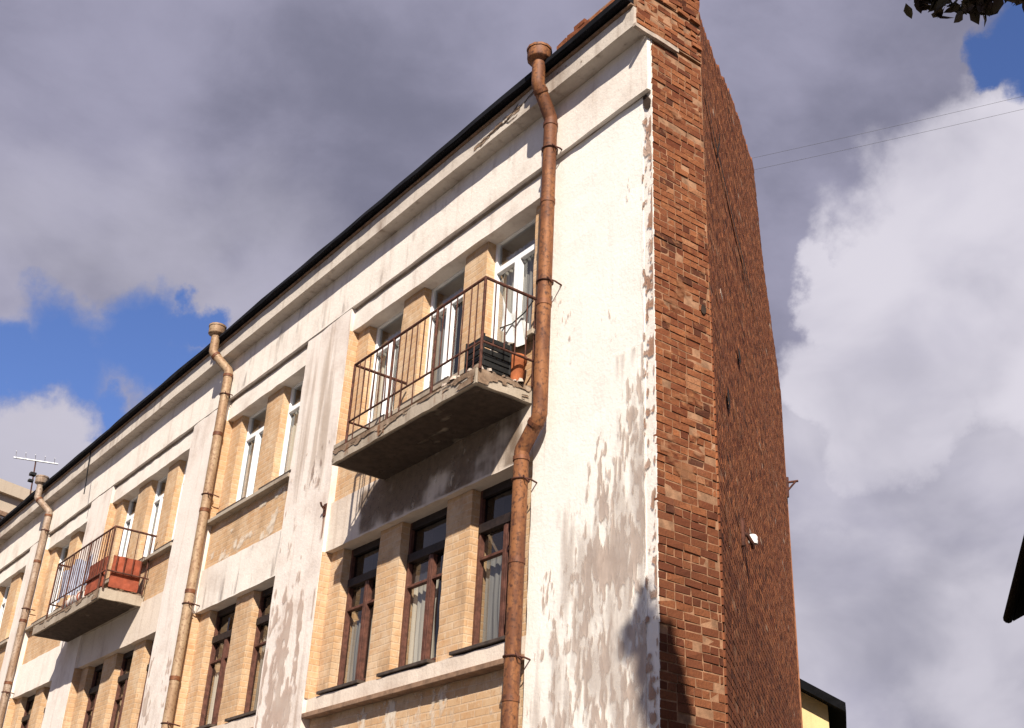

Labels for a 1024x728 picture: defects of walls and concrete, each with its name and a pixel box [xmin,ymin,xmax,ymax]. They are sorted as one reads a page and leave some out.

spalling [304,368,531,489]
peeling [538,95,659,728]
peeling [255,572,315,728]